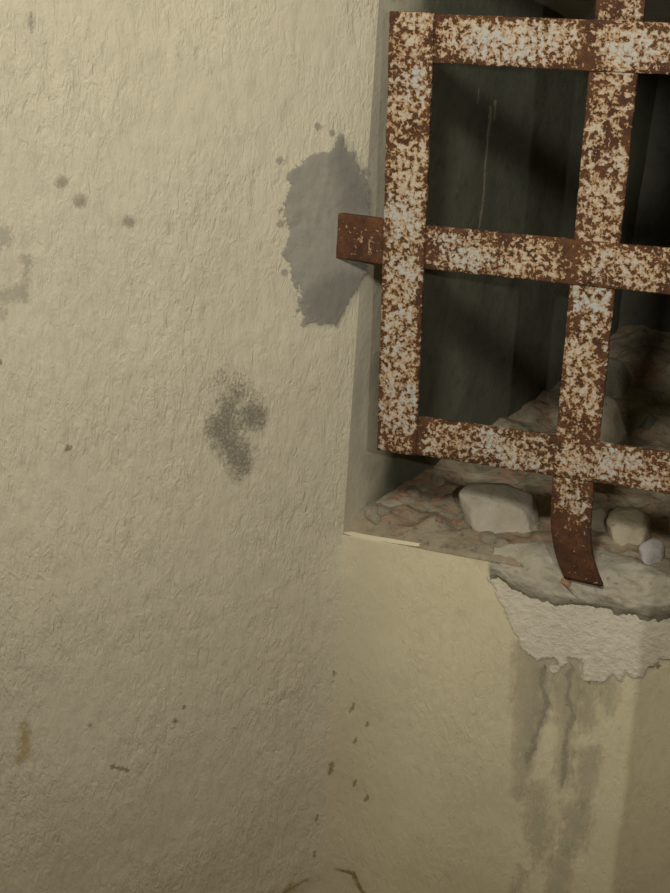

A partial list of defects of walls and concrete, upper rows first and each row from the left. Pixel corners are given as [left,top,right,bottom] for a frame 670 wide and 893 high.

peeling [487,575,670,682]